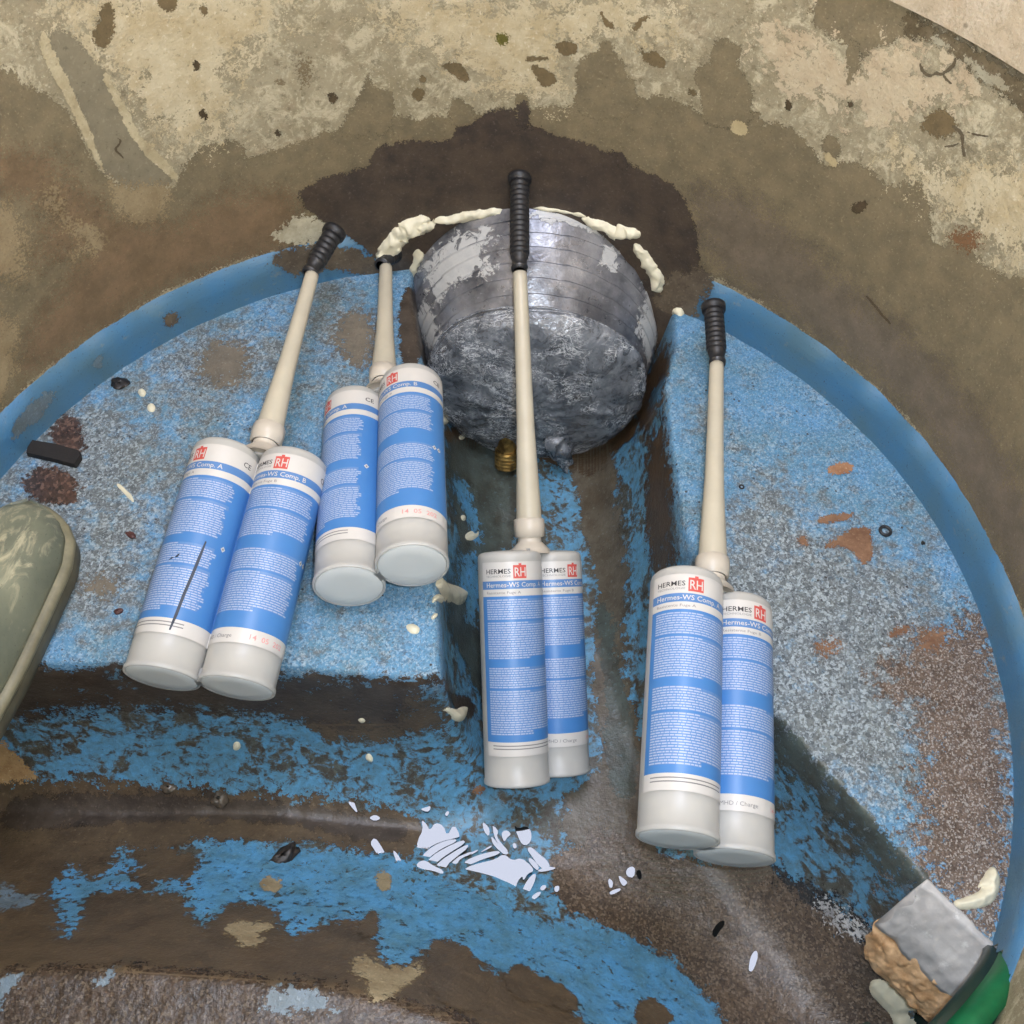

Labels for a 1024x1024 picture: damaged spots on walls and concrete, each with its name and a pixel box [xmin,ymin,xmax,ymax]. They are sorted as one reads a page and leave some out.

leakage [0,0,1024,615]
corrosion [827,461,854,476]
peeling [0,769,587,1024]